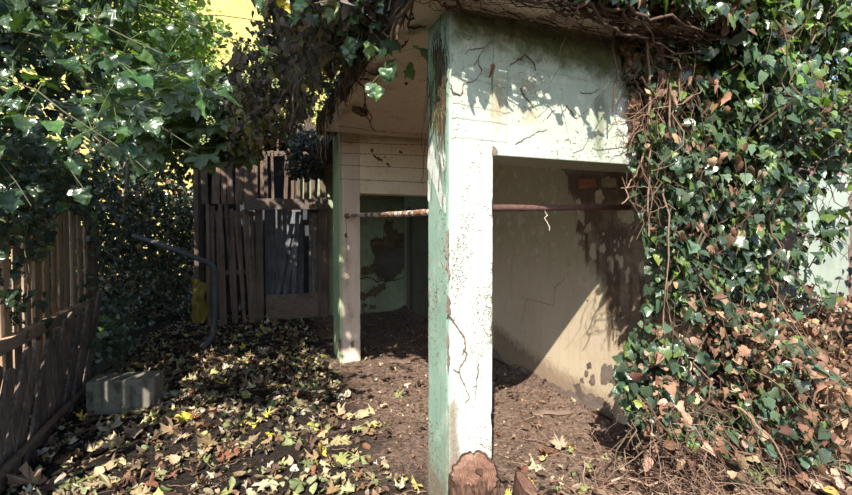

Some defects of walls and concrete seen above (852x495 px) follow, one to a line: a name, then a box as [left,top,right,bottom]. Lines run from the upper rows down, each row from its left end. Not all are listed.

crack [451,66,508,143]
spalling [360,219,404,310]
peeling [562,96,674,373]
water stain [585,234,667,347]
spalling [492,347,617,421]